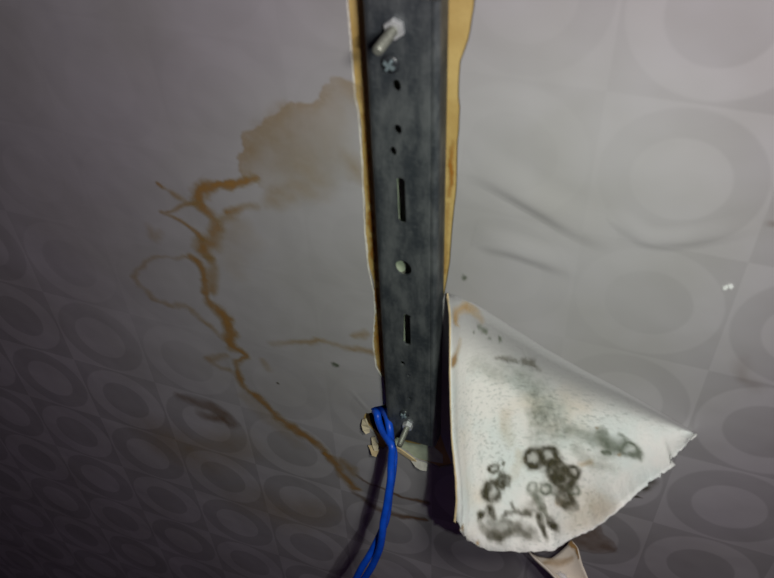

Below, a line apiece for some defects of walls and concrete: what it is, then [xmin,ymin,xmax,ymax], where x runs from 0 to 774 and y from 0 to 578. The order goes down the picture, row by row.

damp [174,176,360,490]
peeling [346,0,697,578]
damp [486,530,512,542]
damp [478,446,581,537]
damp [601,438,642,459]